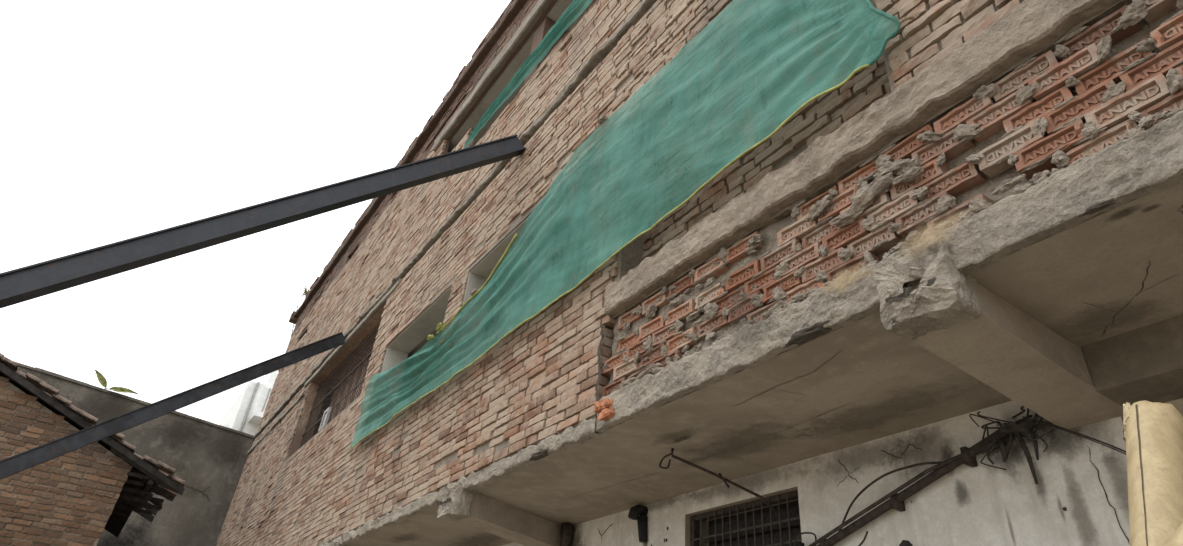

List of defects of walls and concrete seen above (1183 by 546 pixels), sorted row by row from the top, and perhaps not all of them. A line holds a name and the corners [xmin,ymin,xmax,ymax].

spalling [594,0,1183,421]
crack [1080,260,1177,335]
spalling [437,481,476,522]